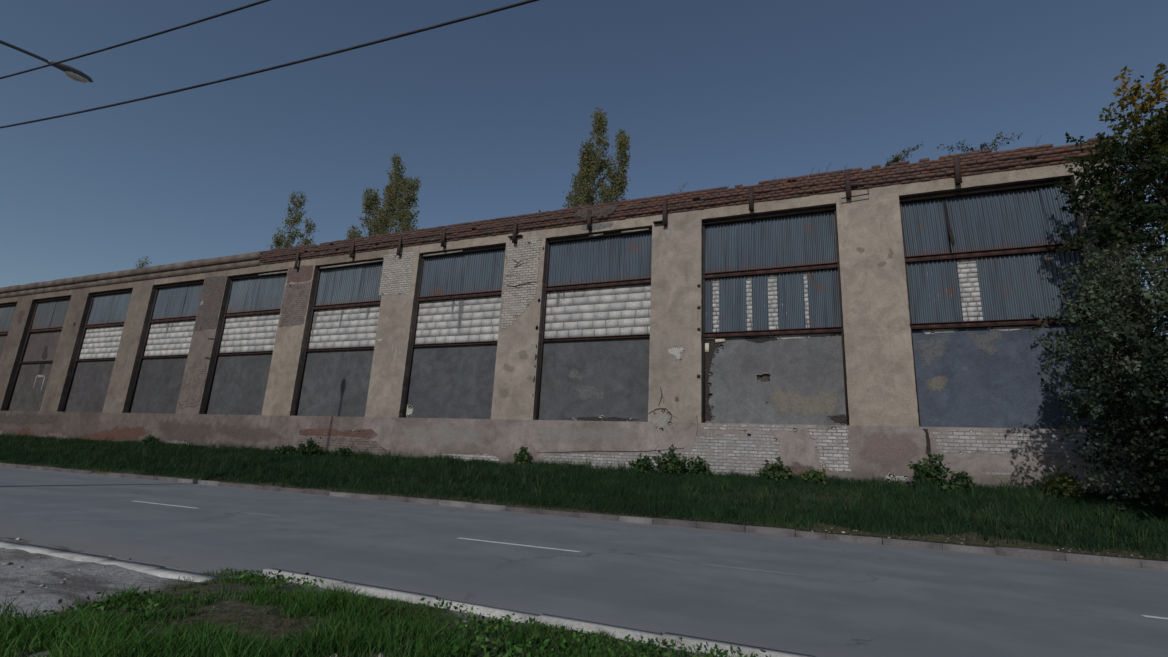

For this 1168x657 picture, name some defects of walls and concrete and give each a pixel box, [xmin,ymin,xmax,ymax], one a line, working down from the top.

flaking render [379,251,415,296]
flaking render [501,236,544,330]
flaking render [295,428,391,457]
flaking render [544,338,851,477]